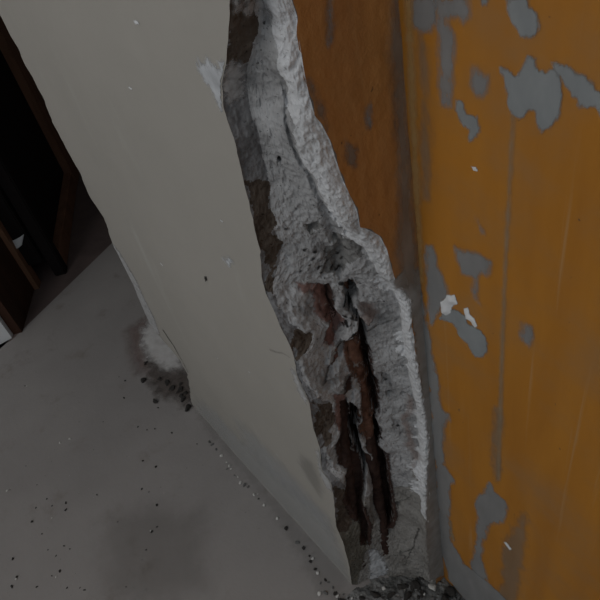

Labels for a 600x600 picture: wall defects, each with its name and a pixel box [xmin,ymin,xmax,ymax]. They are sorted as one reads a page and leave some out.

peeling [507,0,538,38]
peeling [499,55,600,132]
rust [296,282,344,346]
spalling [196,0,507,600]
rust [335,316,398,546]